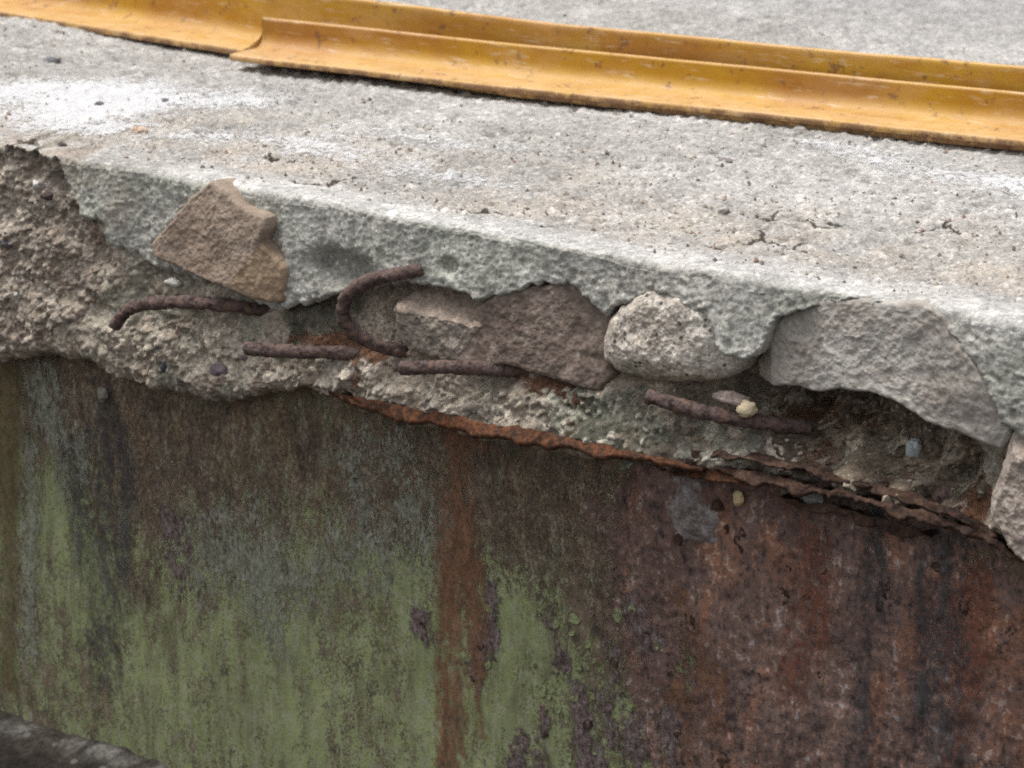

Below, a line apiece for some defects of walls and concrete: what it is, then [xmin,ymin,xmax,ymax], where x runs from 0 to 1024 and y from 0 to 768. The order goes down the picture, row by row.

spalling [0,139,117,357]
corrosion [287,331,389,391]
spalling [101,314,992,521]
corrosion [515,371,589,437]
corrosion [768,391,885,436]
damp [0,356,138,694]
damp [159,420,457,665]
peeling [408,605,435,647]
corrosion [582,441,1024,768]